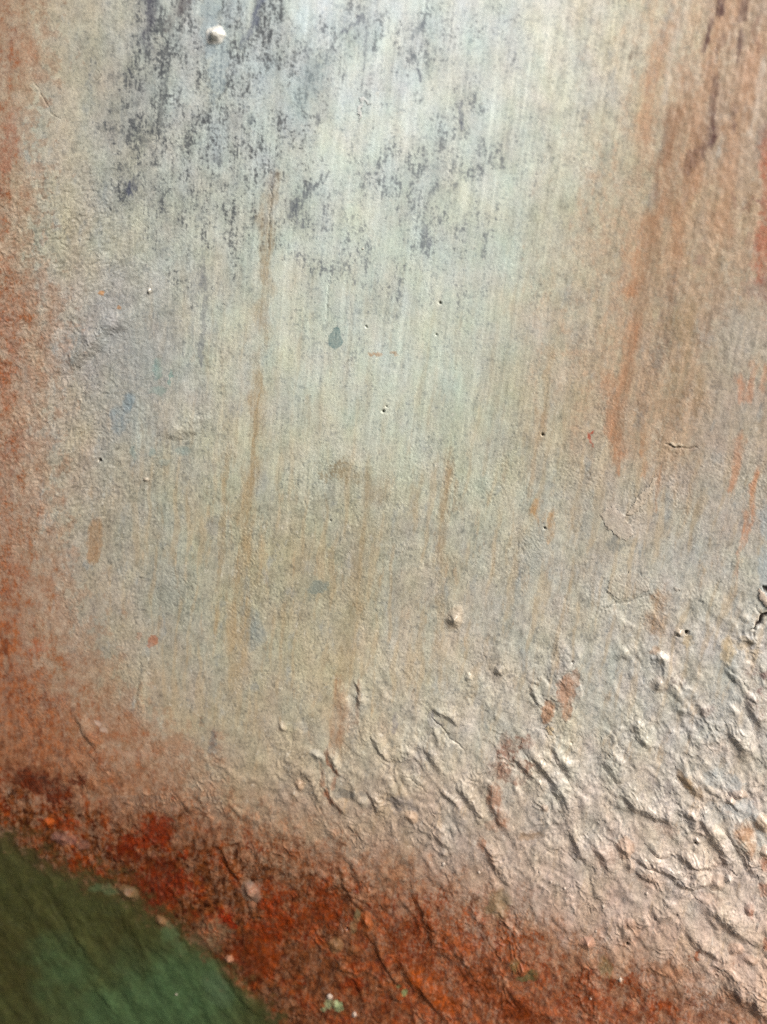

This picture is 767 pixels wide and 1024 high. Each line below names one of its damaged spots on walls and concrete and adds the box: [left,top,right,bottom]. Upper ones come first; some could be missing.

water stain [61,0,567,467]
corrosion [509,0,767,582]
corrosion [0,730,762,1024]
corrosion [756,865,767,898]